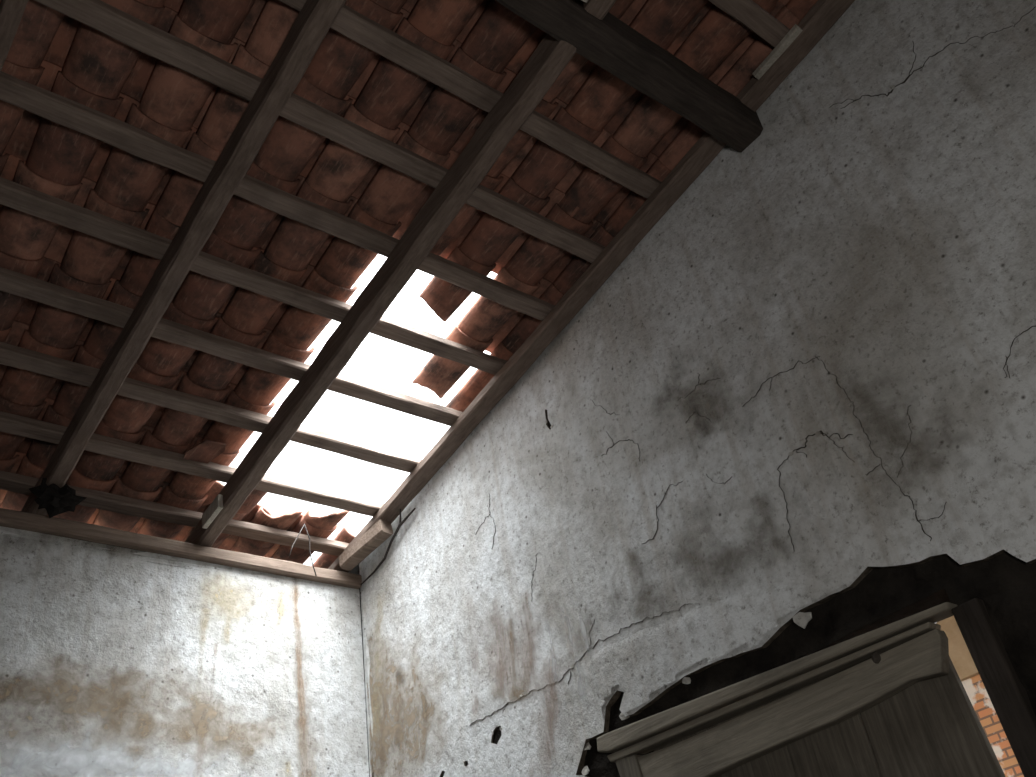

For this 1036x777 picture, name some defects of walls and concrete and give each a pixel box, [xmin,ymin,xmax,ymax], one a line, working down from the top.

crack [643,482,681,544]
crack [742,356,946,549]
water stain [0,660,158,773]
water stain [178,693,253,751]
water stain [367,636,435,777]
crack [470,604,688,725]
flaking render [581,739,620,777]
flaking render [608,551,1036,732]